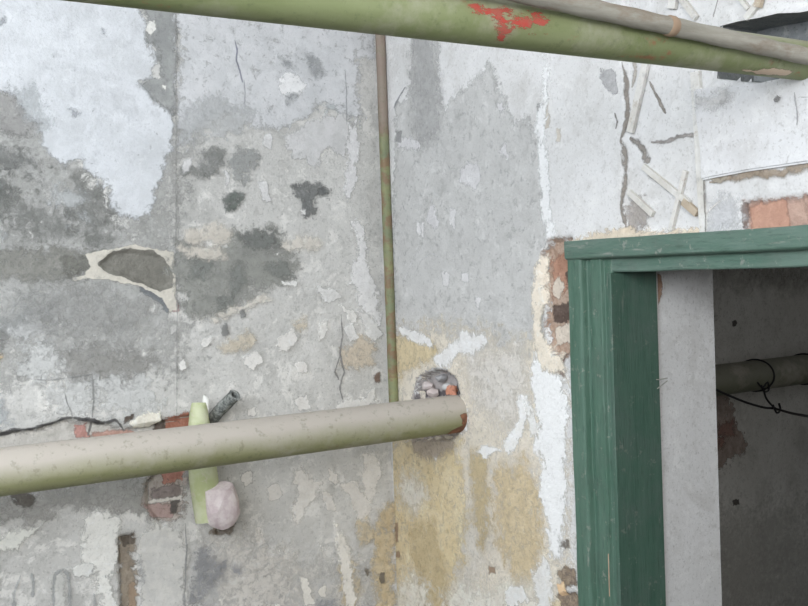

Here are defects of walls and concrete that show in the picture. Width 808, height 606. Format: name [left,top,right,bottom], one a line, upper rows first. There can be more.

spalling [720,11,808,41]
spalling [717,68,793,82]
crack [703,163,808,232]
spalling [740,193,808,229]
spalling [73,244,179,313]
damp [0,109,321,423]
peeling [317,214,383,346]
peeling [392,39,579,606]
peeling [242,351,263,370]
crack [0,374,124,436]
damp [392,314,573,606]
peeling [136,471,192,606]